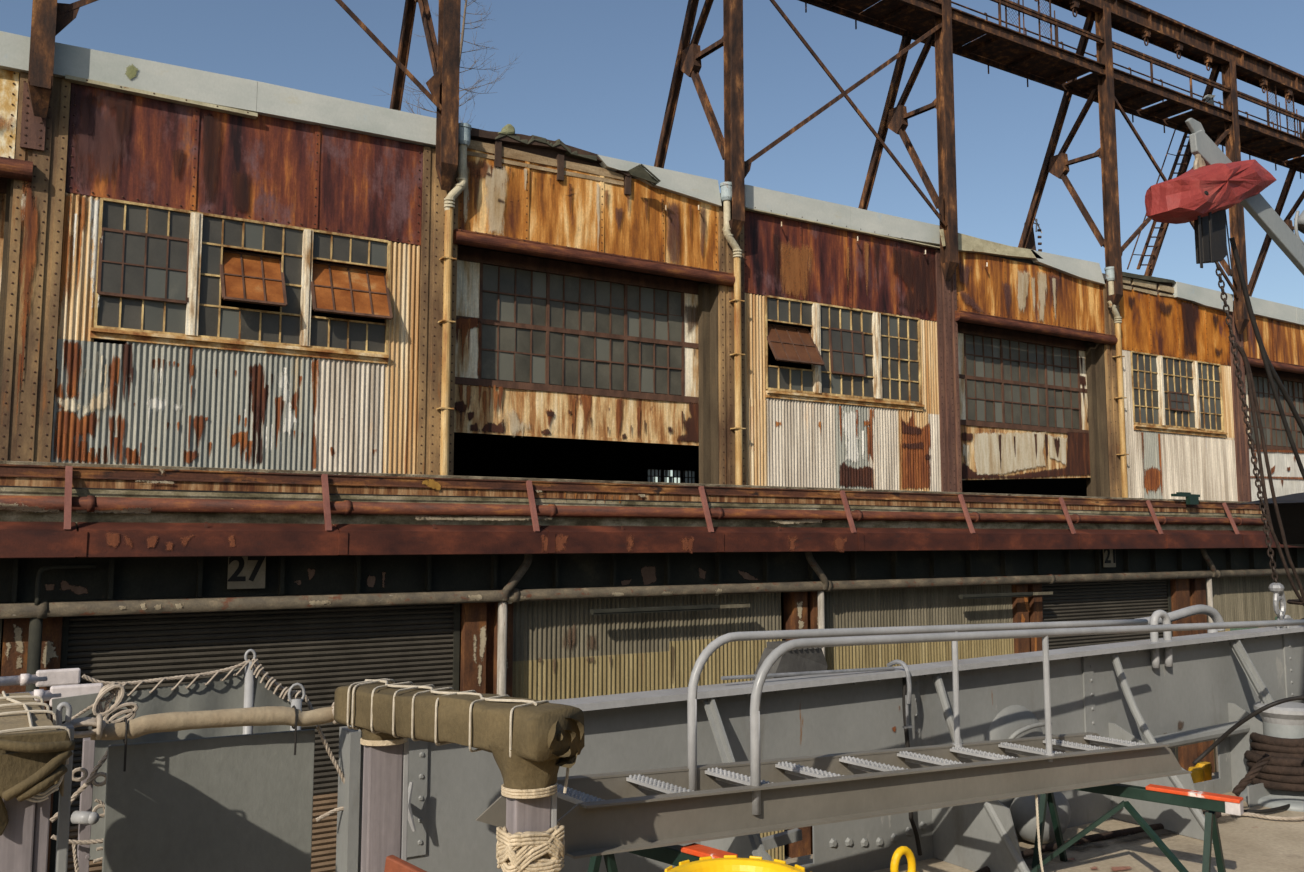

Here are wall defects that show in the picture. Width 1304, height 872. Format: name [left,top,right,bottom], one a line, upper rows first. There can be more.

corrosion [203,114,250,211]
corrosion [467,159,492,209]
corrosion [605,190,706,264]
corrosion [773,234,811,299]
corrosion [846,242,936,318]
corrosion [1002,283,1012,314]
corrosion [1160,301,1198,355]
peeling [502,410,530,435]
corrosion [0,340,1262,514]
peeling [842,410,864,463]
peeling [963,431,1067,475]
corrosion [541,534,568,551]